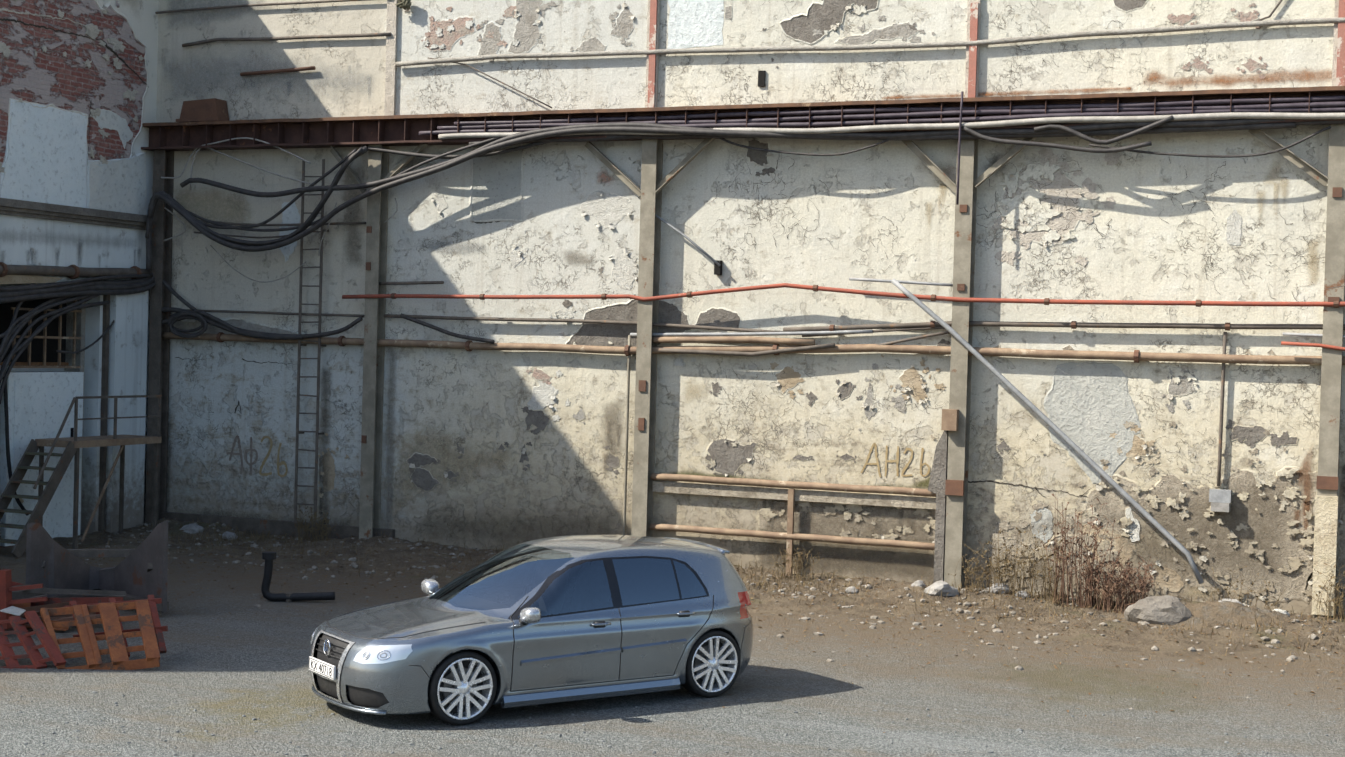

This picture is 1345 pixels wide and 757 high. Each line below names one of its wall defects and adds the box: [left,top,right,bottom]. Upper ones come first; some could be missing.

spalling [421,0,556,64]
spalling [762,0,936,46]
flaking render [0,0,149,208]
spalling [658,299,742,346]
peeling [497,368,586,471]
spalling [705,437,758,478]
spalling [770,362,817,406]
spalling [835,354,884,431]
crack [873,363,949,442]
spalling [890,359,946,413]
crack [968,365,1092,497]
spalling [965,345,1318,607]